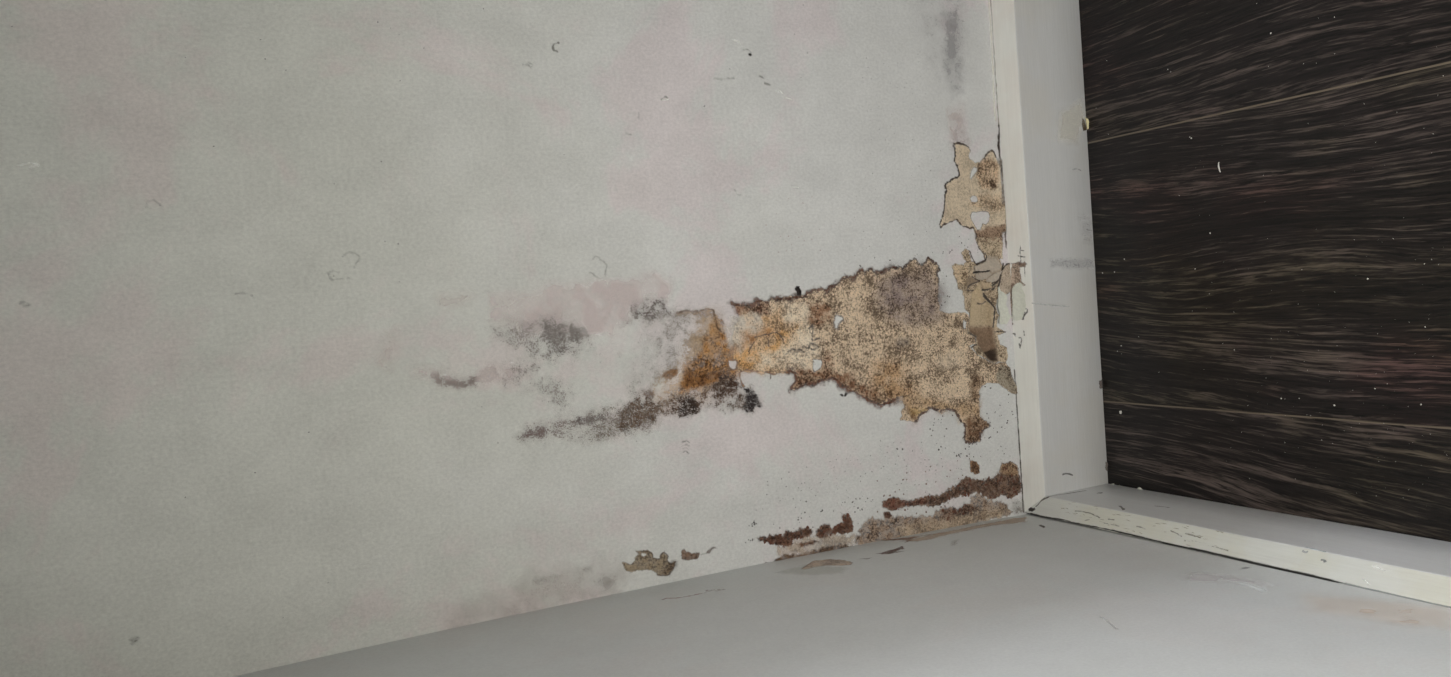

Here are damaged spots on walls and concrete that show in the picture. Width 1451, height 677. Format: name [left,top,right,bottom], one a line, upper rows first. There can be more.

leakage [419,282,761,442]
peeling [721,142,1028,457]
peeling [622,547,716,576]